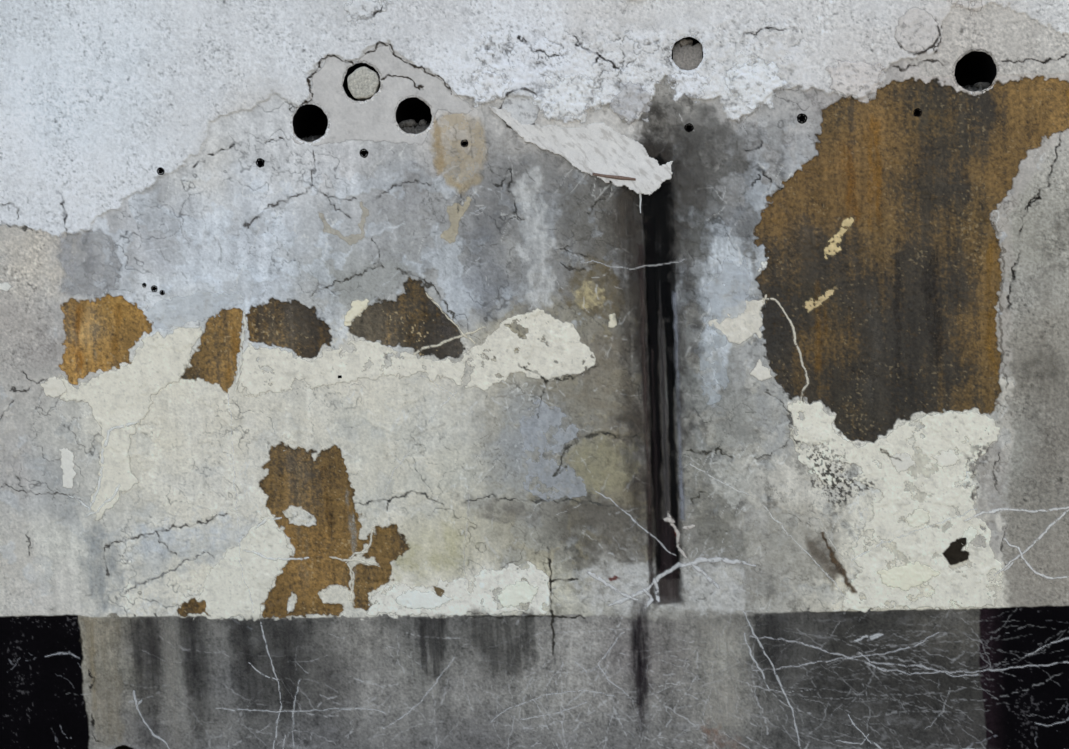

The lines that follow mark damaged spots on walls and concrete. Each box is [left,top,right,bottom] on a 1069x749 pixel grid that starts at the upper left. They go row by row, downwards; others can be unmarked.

flaking render [289,41,473,145]
hole [951,48,1000,95]
crack [243,151,356,228]
corrosion [753,76,1069,443]
corrosion [181,298,332,393]
corrosion [348,277,465,360]
peeling [238,308,596,397]
water stain [638,155,706,604]
crack [104,513,227,592]
corrosion [259,442,410,619]
crack [360,432,640,510]
peeling [788,400,1003,612]